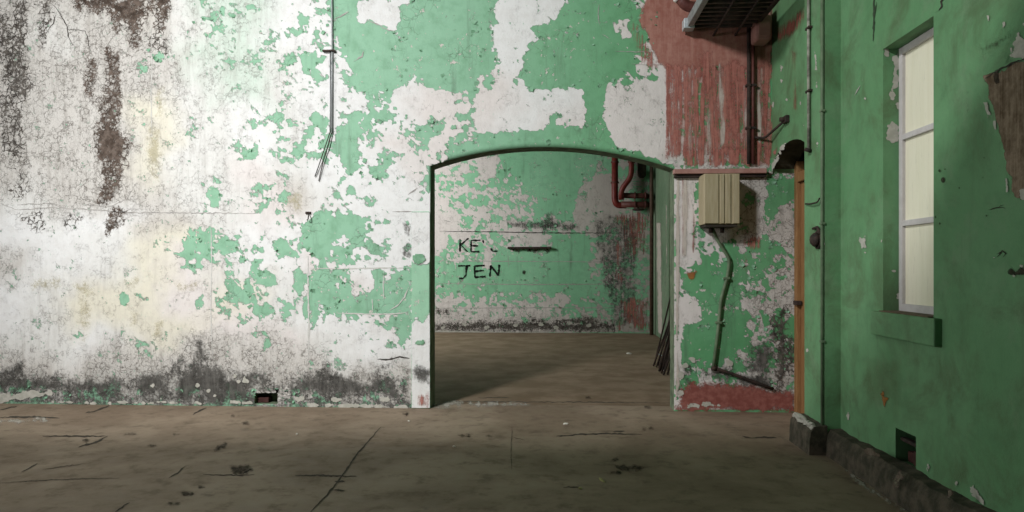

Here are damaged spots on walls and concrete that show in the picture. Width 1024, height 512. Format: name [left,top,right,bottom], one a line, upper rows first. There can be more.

leakage [0,0,54,198]
leakage [72,0,171,236]
corrosion [633,0,801,167]
spalling [983,23,1024,200]
leakage [0,341,429,416]
peeling [0,0,816,430]
leakage [435,215,636,333]
leakage [676,305,794,413]